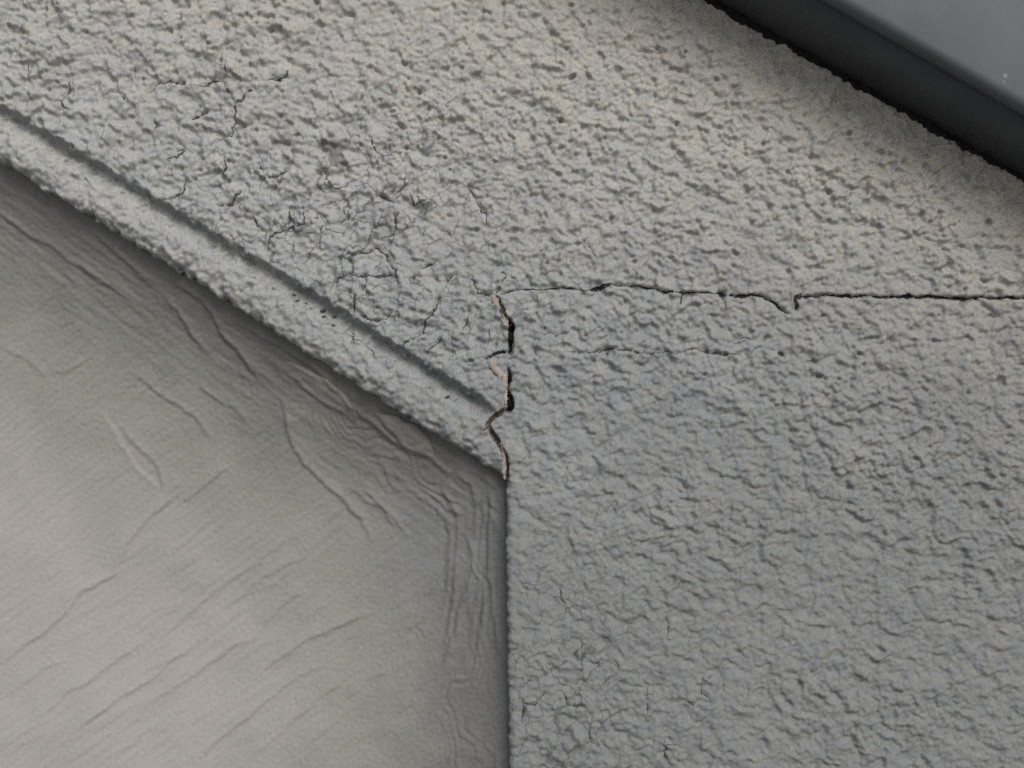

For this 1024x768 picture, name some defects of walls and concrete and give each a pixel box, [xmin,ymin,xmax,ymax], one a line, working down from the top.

crack [112,65,1024,482]